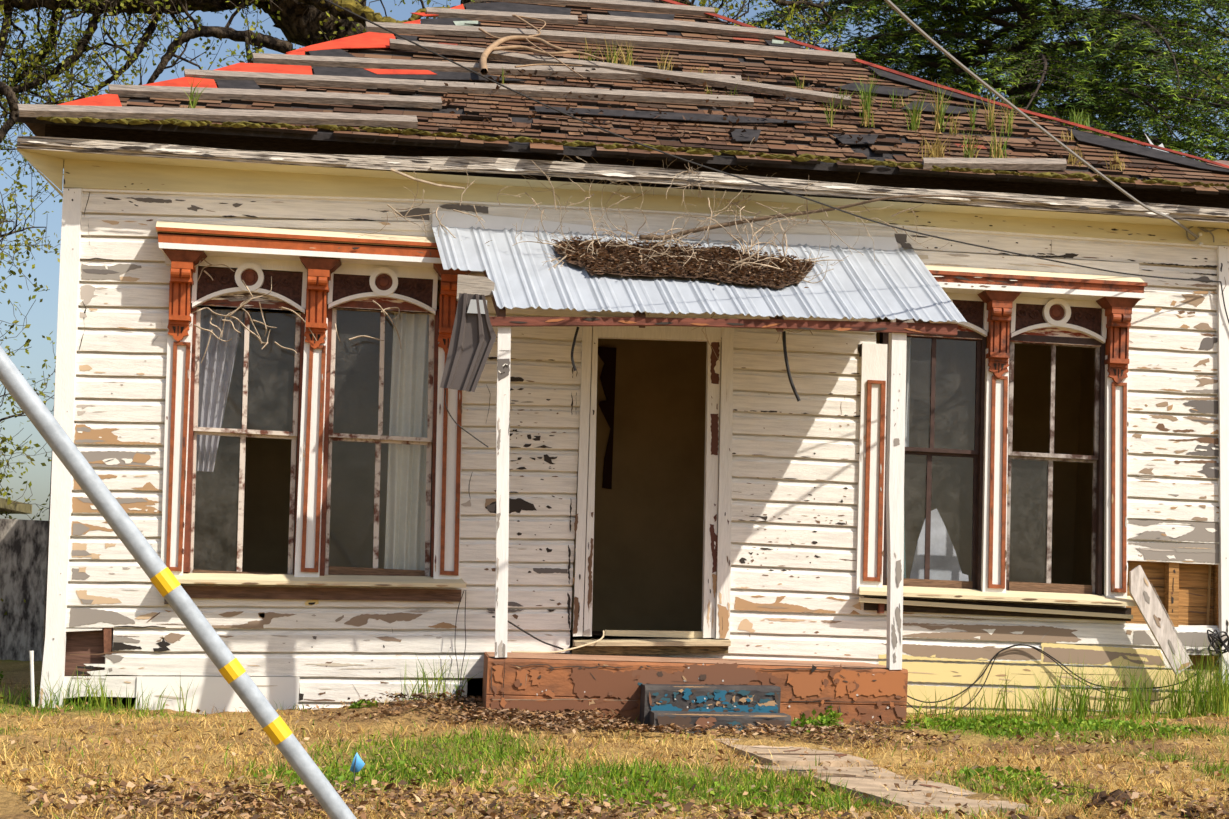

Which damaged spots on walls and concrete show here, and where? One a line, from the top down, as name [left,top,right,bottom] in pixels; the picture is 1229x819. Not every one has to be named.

peeling [84,146,215,157]
peeling [102,183,257,225]
peeling [348,204,488,225]
peeling [67,405,162,514]
peeling [456,337,566,531]
peeling [710,404,736,455]
peeling [1125,347,1227,573]
peeling [212,611,298,644]
peeling [344,609,457,656]
peeling [484,512,593,693]
peeling [707,480,861,672]
peeling [881,578,1228,694]